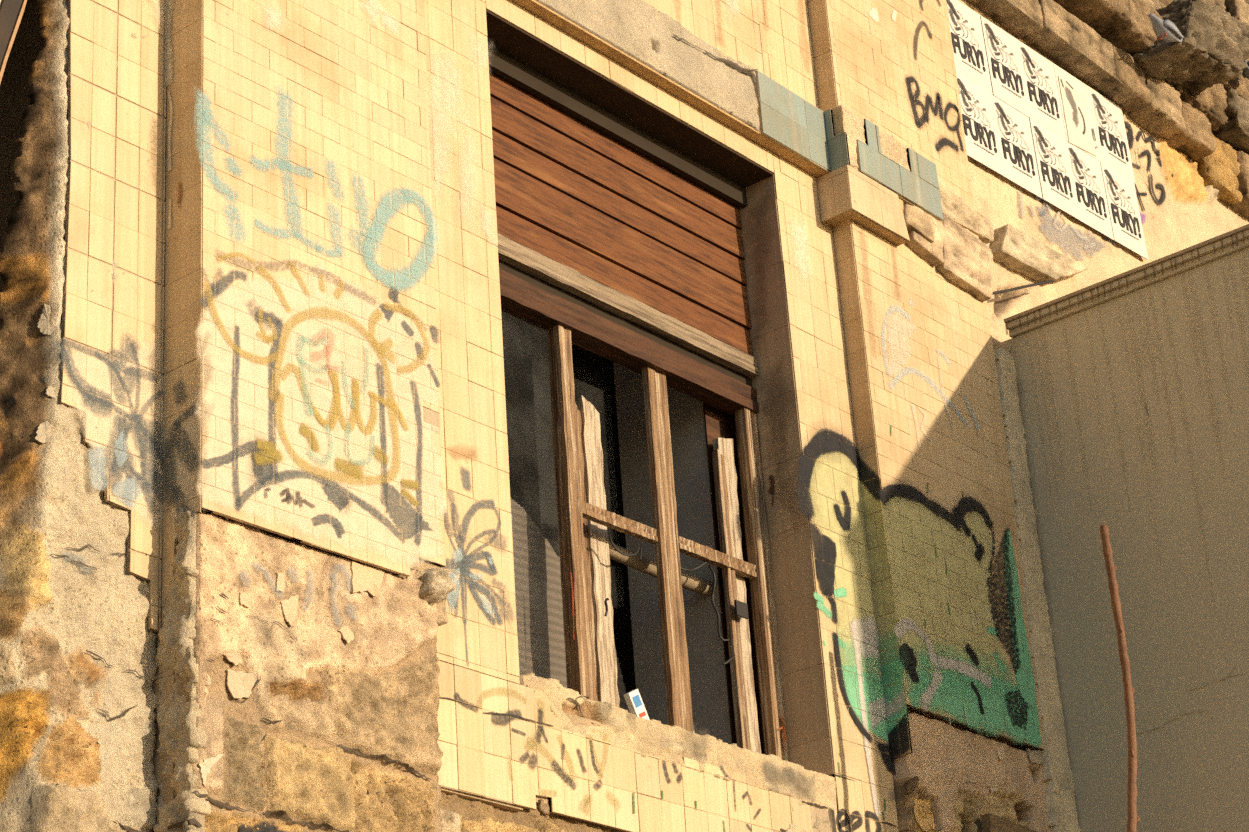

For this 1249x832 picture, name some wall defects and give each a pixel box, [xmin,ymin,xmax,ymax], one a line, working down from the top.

spalling [0,0,160,832]
peeling [275,573,299,627]
peeling [351,561,385,597]
peeling [337,625,354,644]
peeling [222,651,255,699]
peeling [198,754,224,787]
peeling [537,799,550,815]
peeling [903,776,936,831]